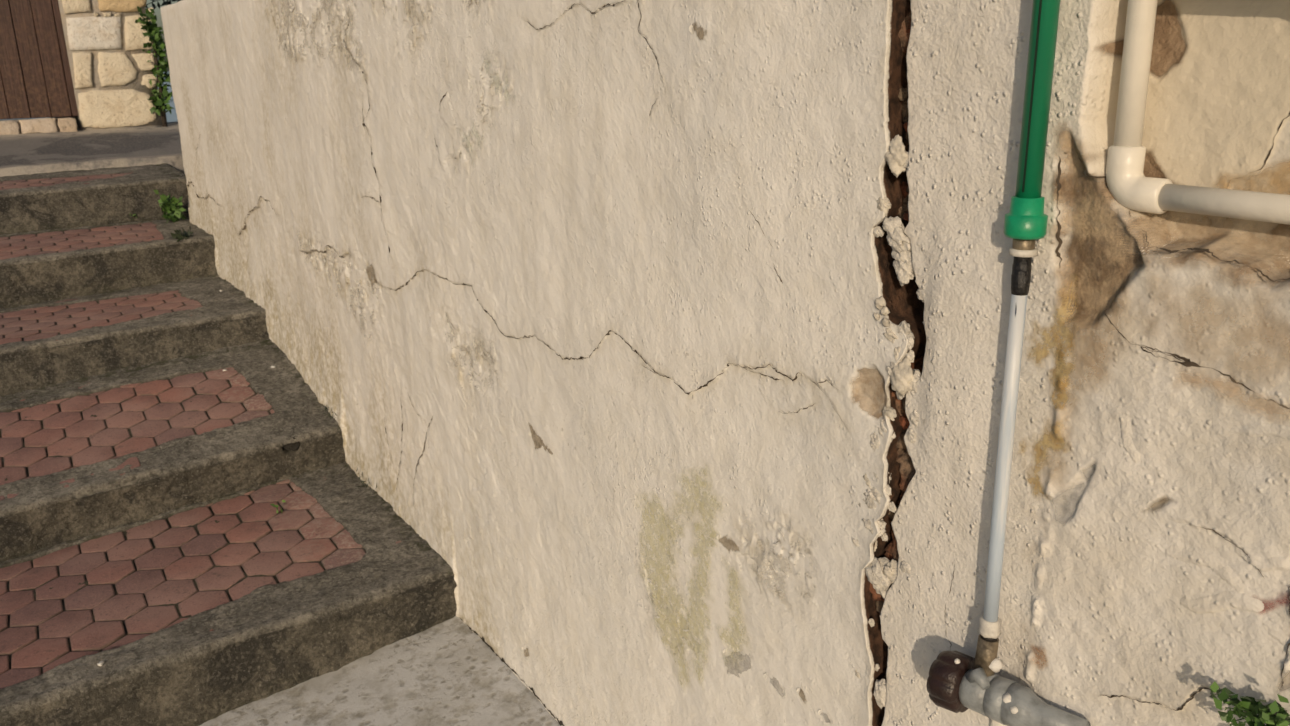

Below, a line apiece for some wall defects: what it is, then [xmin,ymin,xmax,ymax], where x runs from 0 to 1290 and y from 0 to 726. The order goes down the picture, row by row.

flaking render [1101,40,1124,56]
flaking render [1150,0,1186,77]
flaking render [1143,153,1166,179]
crack [345,0,924,709]
crack [1105,304,1290,409]
water stain [644,477,715,680]
crack [1191,525,1290,692]
crack [459,616,564,726]
crack [1102,687,1211,711]